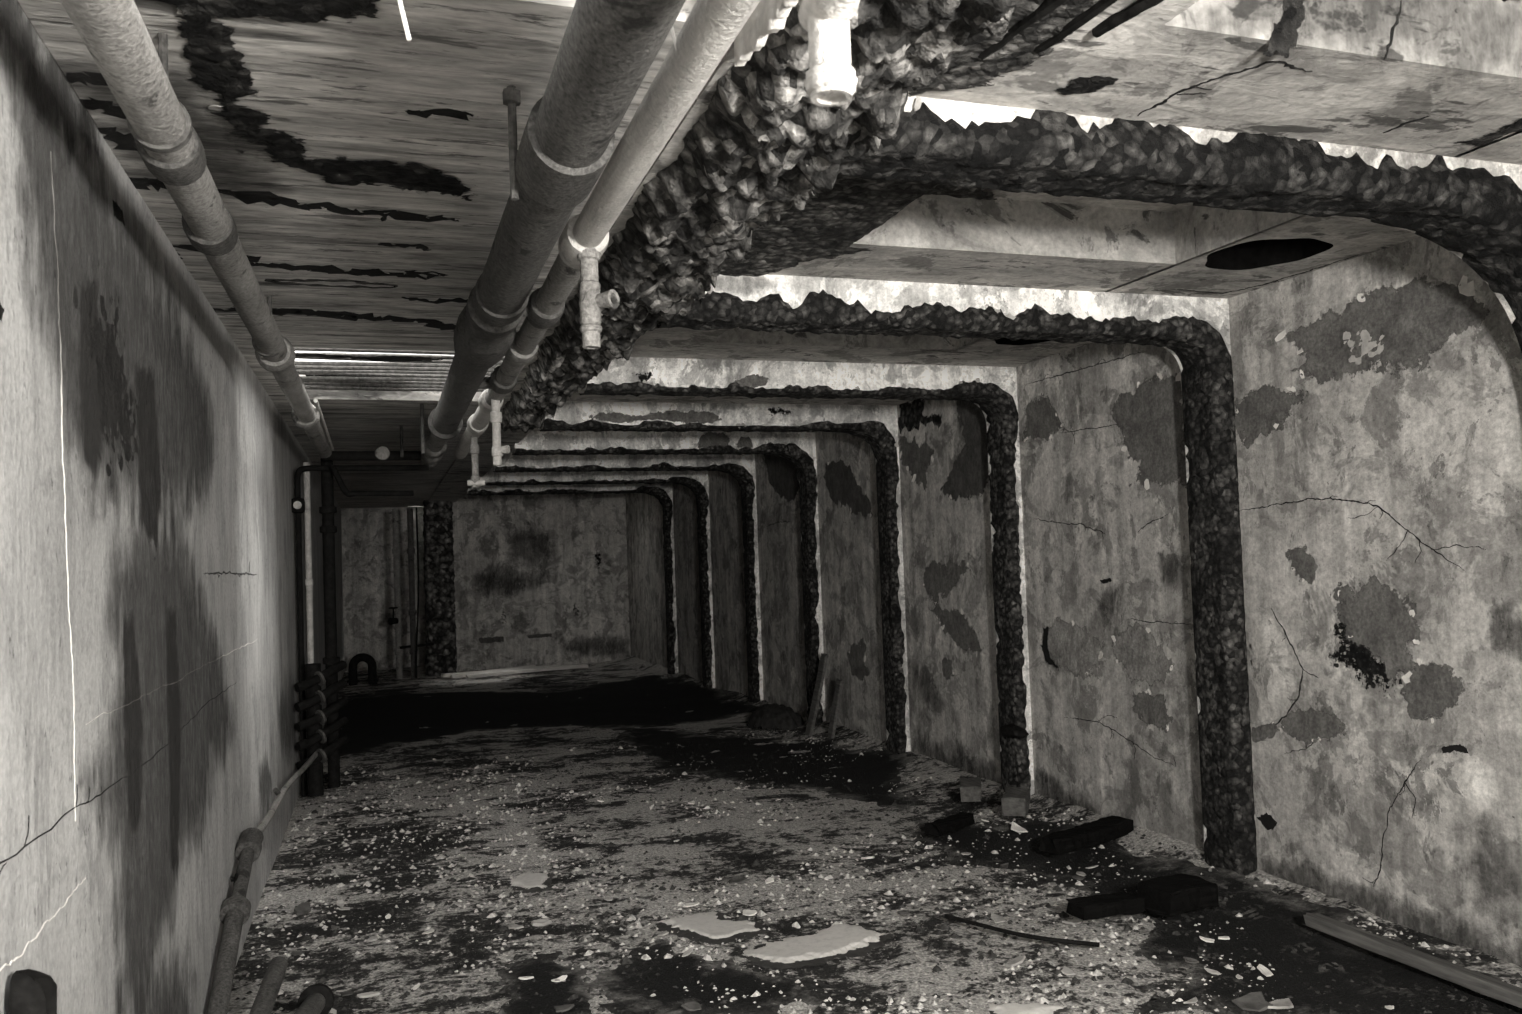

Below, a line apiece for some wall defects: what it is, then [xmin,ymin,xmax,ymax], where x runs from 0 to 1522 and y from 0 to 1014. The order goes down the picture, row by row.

crack [0,339,161,873]
damp [0,0,233,1014]
damp [171,73,278,189]
damp [264,279,398,289]
spalling [467,0,1522,875]
crack [0,878,86,971]